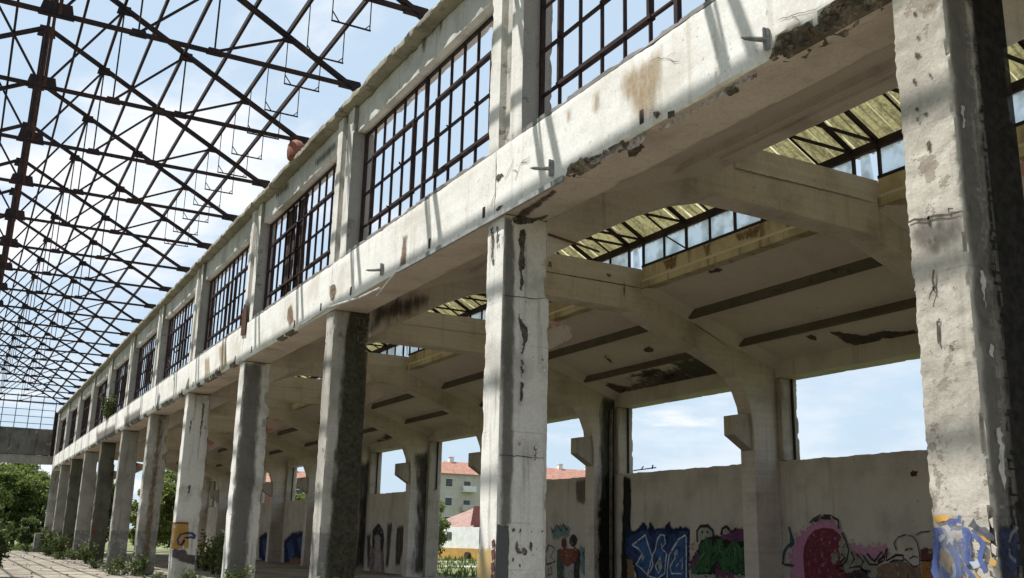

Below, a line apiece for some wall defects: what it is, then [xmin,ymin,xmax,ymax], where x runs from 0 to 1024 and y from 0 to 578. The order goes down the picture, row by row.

spalling [769,0,882,61]
spalling [566,73,758,178]
peeling [512,191,555,291]
crack [908,208,962,226]
peeling [518,309,531,406]
peeling [796,328,918,345]
leakage [326,297,424,578]
leakage [595,358,717,578]